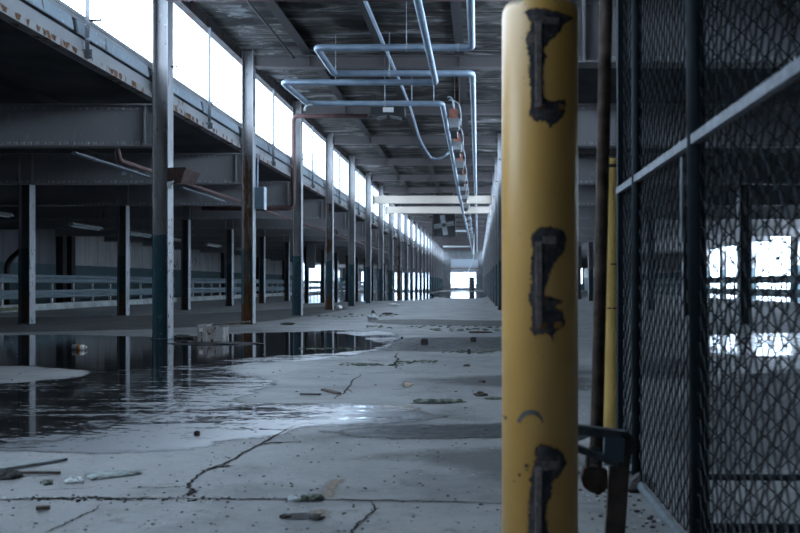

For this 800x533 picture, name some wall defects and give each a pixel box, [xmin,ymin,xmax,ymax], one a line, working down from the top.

rust [0,4,85,57]
rust [244,155,252,324]
crack [334,353,400,399]
crack [0,425,296,533]
crack [318,499,502,533]